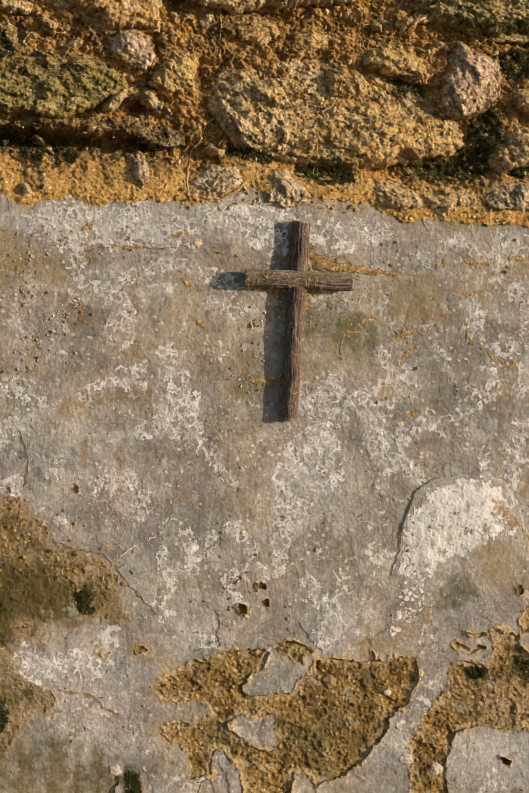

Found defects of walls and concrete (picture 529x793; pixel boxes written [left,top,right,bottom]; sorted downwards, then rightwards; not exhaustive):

spalling [151,361,529,793]
peeling [505,336,529,400]